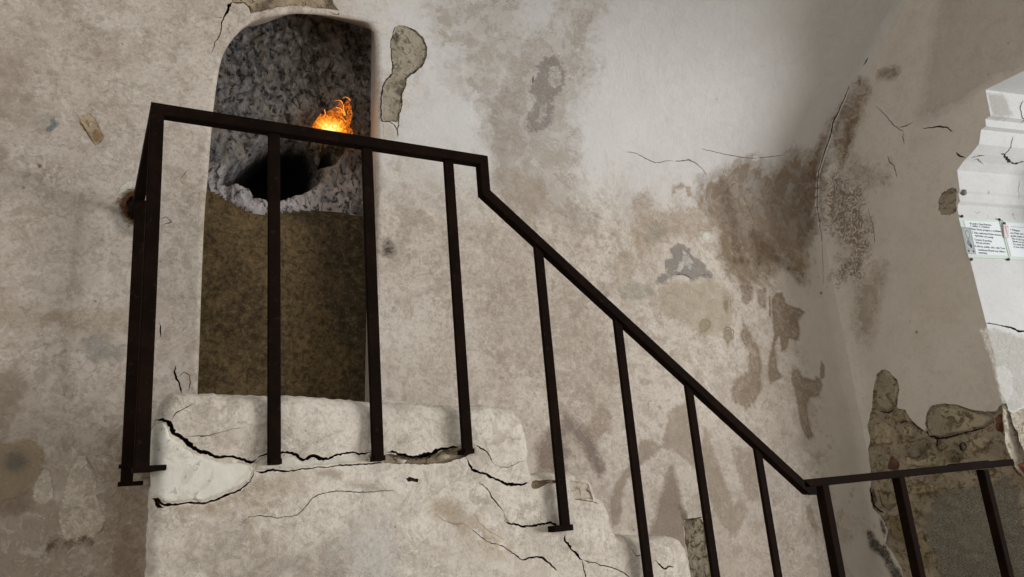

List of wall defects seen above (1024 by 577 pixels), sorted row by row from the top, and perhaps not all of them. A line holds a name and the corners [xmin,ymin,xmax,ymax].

spalling [78,114,104,145]
corrosion [116,181,136,235]
crack [212,2,232,51]
spalling [380,25,427,138]
flaking render [657,243,713,284]
crack [631,149,782,173]
water stain [673,79,872,288]
spalling [938,188,957,215]
crack [879,103,1024,218]
water stain [732,293,824,439]
crack [152,366,673,577]
spalling [867,329,1024,577]